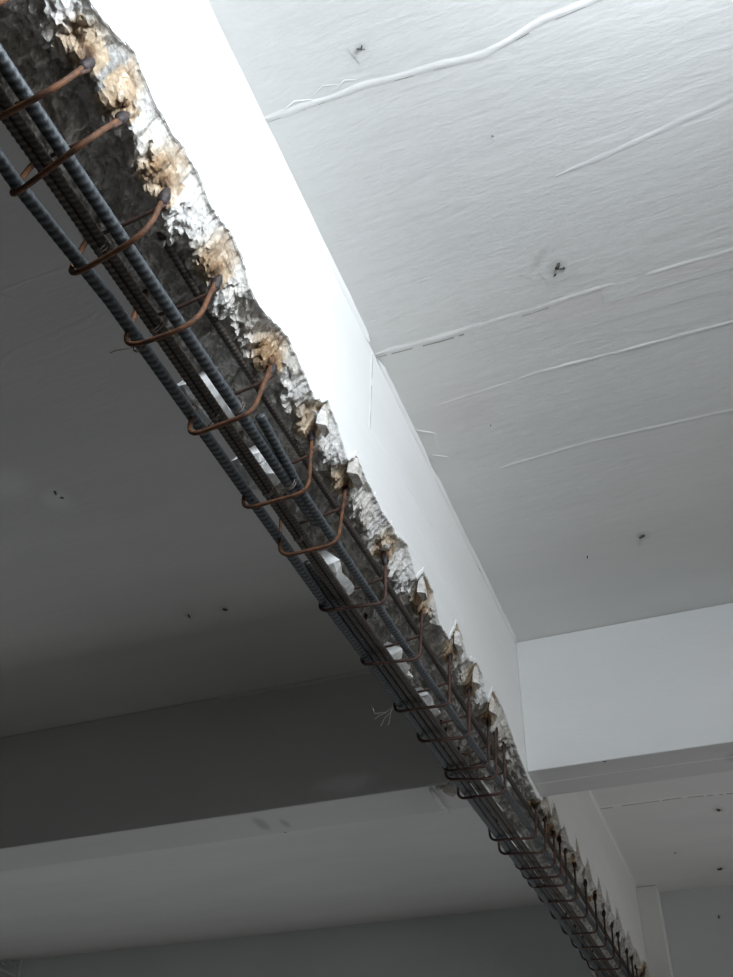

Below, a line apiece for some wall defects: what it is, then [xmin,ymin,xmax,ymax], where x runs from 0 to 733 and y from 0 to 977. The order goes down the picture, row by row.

spalling [0,6,60,112]
crack [264,0,602,122]
spalling [1,86,93,173]
rust [2,0,250,317]
crack [375,277,618,358]
crack [646,247,733,276]
spalling [0,139,650,977]
rust [388,573,503,732]